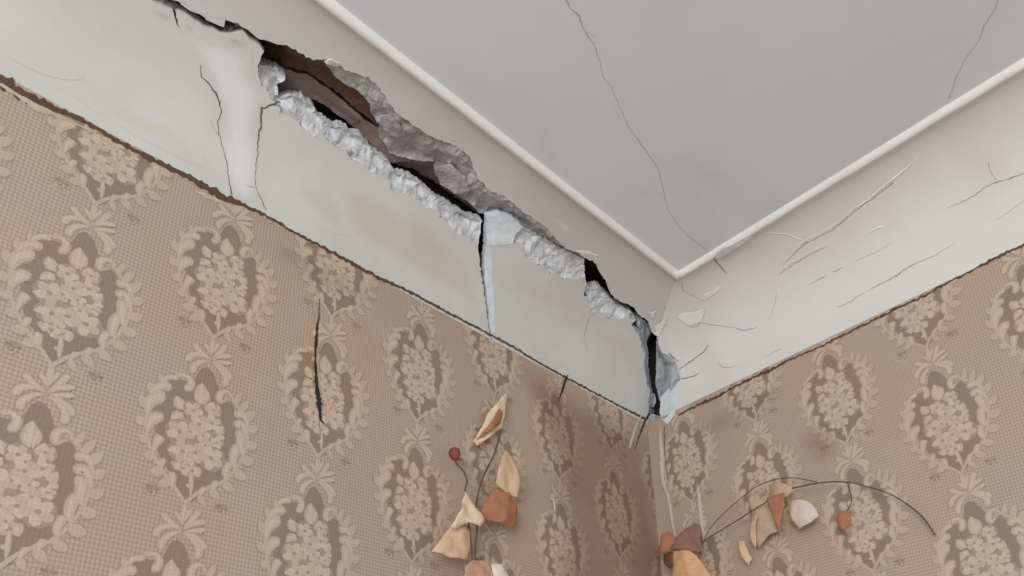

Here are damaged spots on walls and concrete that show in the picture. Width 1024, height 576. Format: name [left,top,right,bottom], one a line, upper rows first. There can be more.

crack [156,0,778,425]
flaking render [483,209,522,332]
peeling [648,286,720,336]
crack [948,162,1024,208]